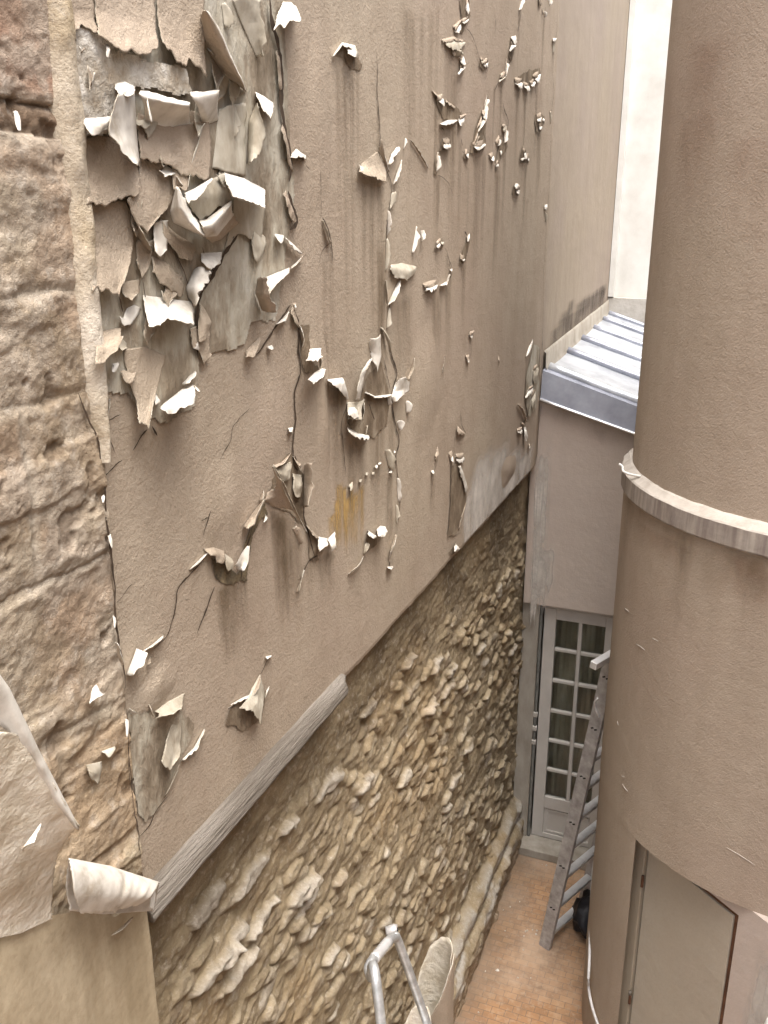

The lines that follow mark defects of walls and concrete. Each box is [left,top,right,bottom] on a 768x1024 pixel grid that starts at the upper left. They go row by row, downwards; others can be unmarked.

peeling [433,0,541,196]
peeling [72,0,310,429]
crack [257,305,301,468]
peeling [299,324,389,471]
crack [78,393,211,688]
peeling [189,448,336,633]
peeling [348,526,397,574]
peeling [430,423,467,555]
peeling [0,675,160,938]
crack [127,715,140,850]
peeling [125,693,205,836]
peeling [226,655,272,731]